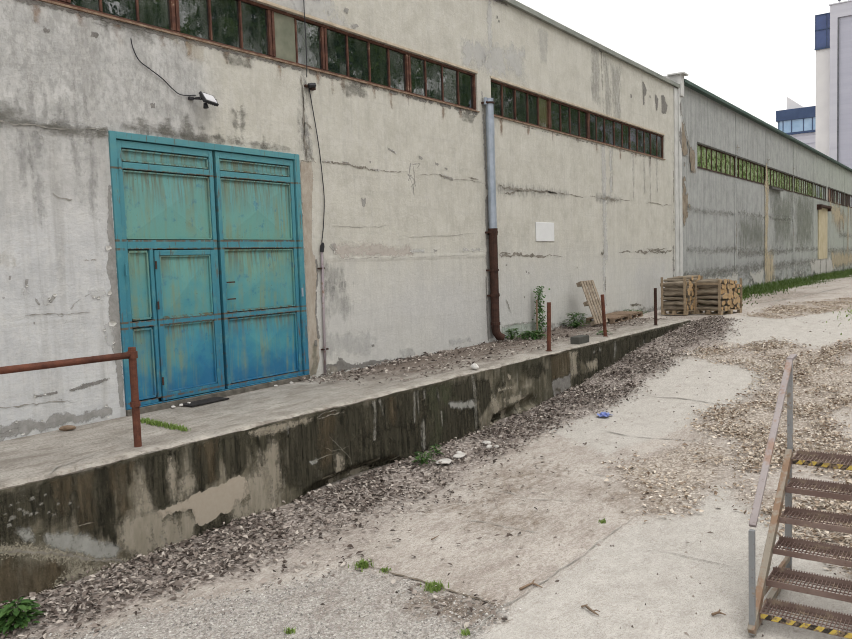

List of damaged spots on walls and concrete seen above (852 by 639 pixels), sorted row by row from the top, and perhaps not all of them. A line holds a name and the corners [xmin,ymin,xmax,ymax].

crack [300,78,668,206]
flaking render [643,82,667,114]
flaking render [464,95,541,341]
leakage [684,165,818,283]
leakage [0,449,180,546]
peeling [0,417,311,588]
leakage [194,513,235,537]
peeling [328,454,369,484]
leakage [193,376,506,492]
leakage [0,558,67,609]